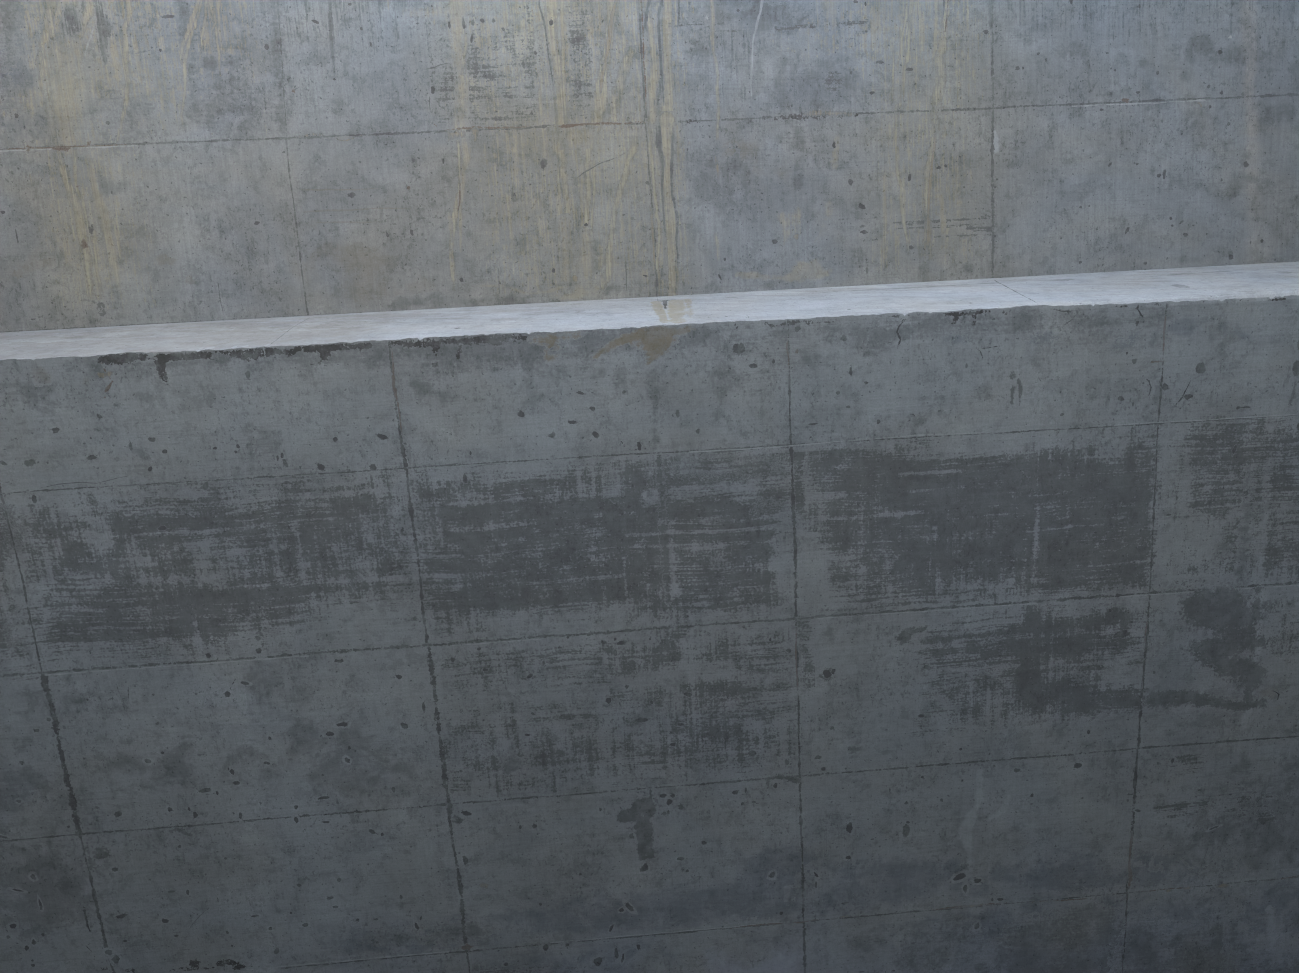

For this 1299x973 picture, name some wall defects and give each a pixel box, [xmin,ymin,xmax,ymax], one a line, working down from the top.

corrosion [526,331,584,364]
corrosion [592,325,696,365]